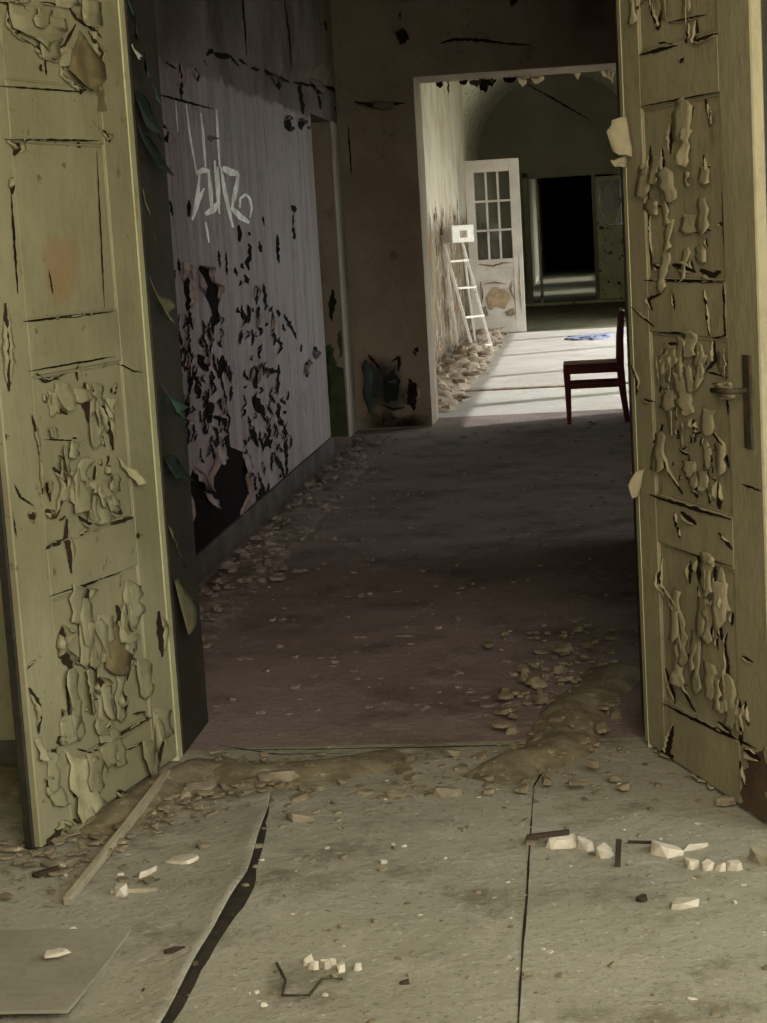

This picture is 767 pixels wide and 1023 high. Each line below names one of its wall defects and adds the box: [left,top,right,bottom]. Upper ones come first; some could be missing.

peeling [0,0,107,112]
peeling [128,1,322,176]
spalling [436,75,544,96]
peeling [149,225,348,554]
peeling [361,355,420,413]
peeling [14,356,175,845]
peeling [169,527,197,635]